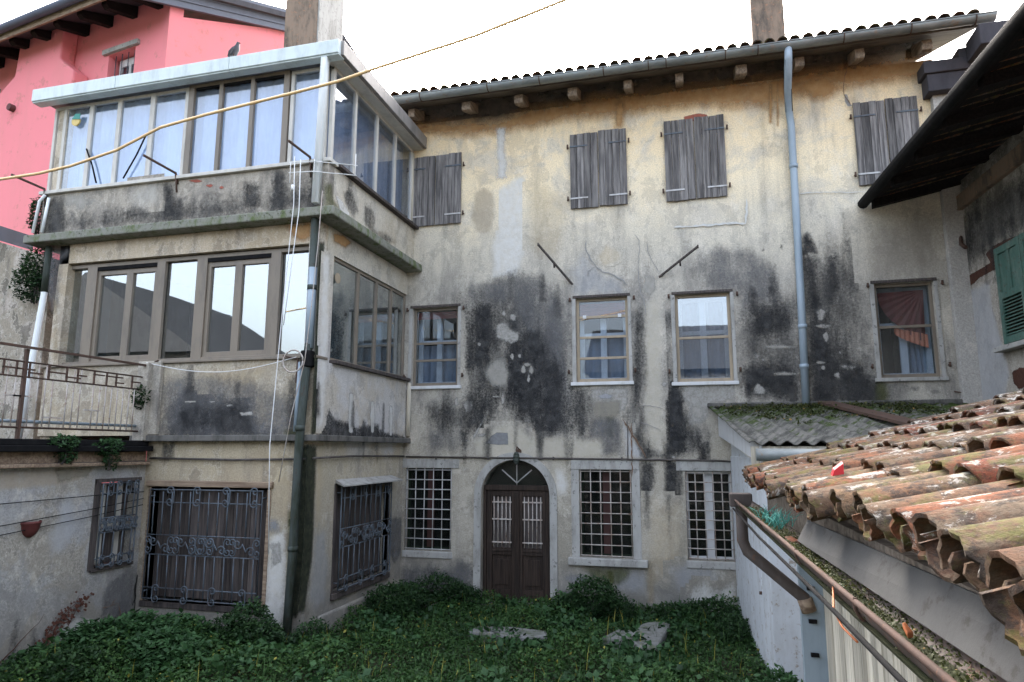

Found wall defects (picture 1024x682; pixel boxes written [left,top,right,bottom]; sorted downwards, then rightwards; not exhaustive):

mould [47,170,373,233]
water stain [159,369,404,618]
mould [429,276,620,460]
water stain [629,314,738,615]
water stain [703,199,949,402]